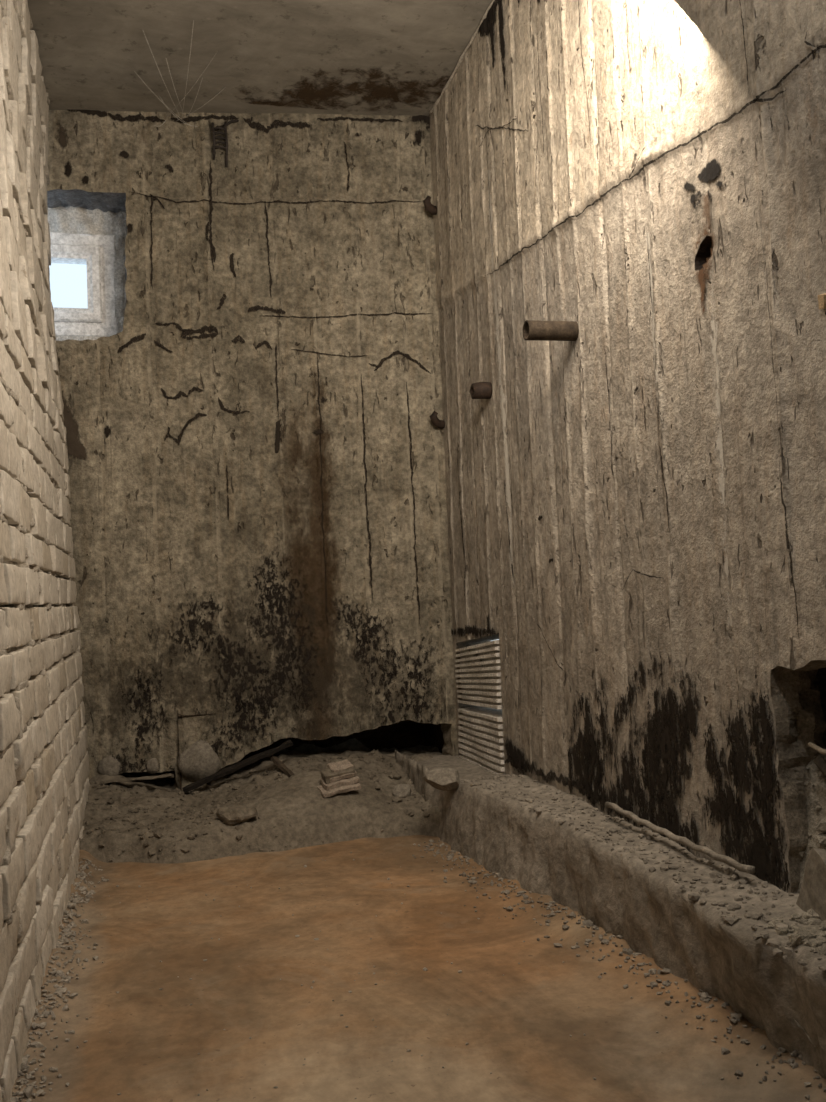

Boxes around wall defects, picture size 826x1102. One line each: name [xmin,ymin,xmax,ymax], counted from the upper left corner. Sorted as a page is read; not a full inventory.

water stain [478,0,506,92]
crack [476,3,826,276]
spalling [695,236,714,271]
crack [68,109,465,627]
water stain [112,668,179,774]
water stain [169,552,320,763]
water stain [331,601,442,725]
peeling [568,653,826,893]
peeling [767,908,826,956]